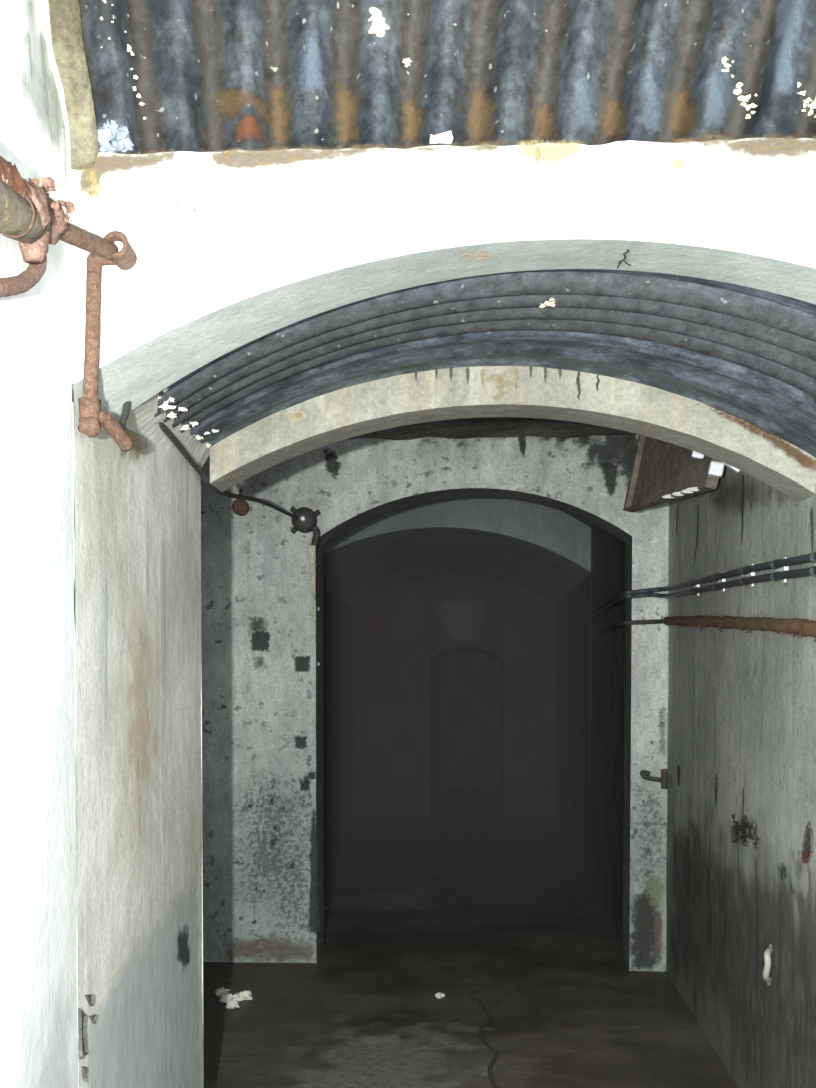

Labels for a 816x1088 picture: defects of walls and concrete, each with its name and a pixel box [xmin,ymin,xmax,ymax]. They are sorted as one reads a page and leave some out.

corrosion [215,88,289,145]
corrosion [337,87,359,142]
corrosion [404,103,423,142]
corrosion [468,88,495,142]
corrosion [518,104,581,165]
corrosion [670,91,697,137]
damp [672,134,816,160]
crack [617,249,631,268]
damp [518,434,638,495]
spalling [731,789,760,851]
damp [248,772,320,933]
damp [628,824,816,1088]